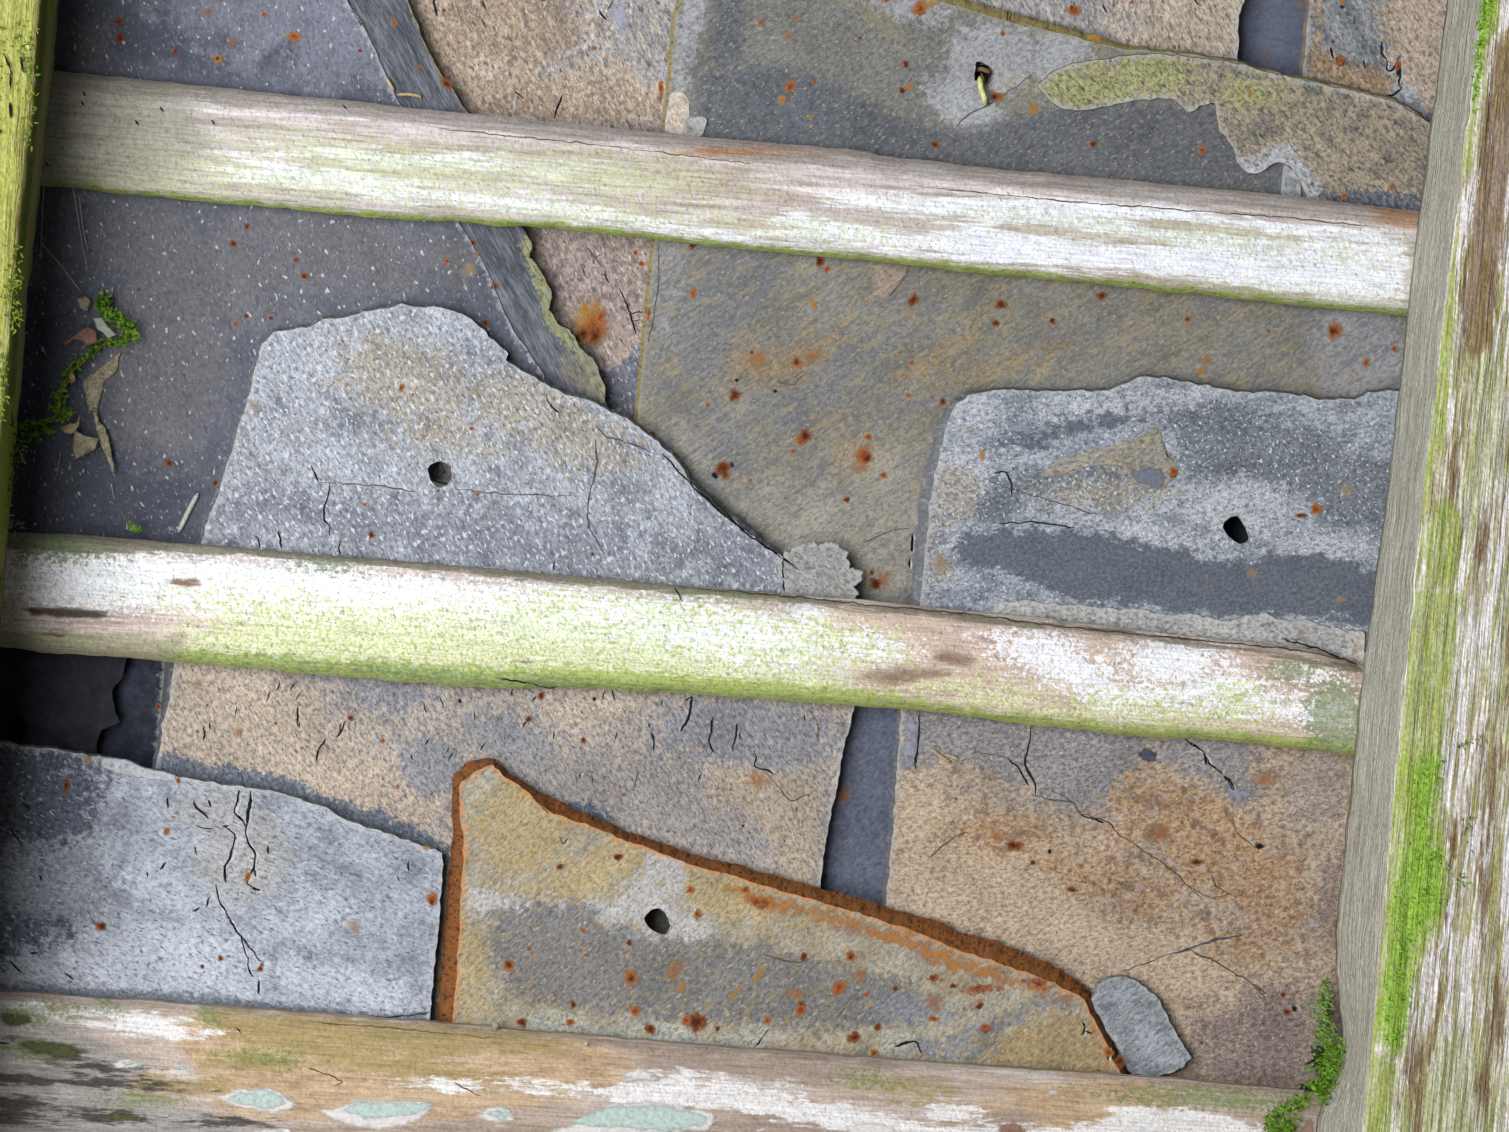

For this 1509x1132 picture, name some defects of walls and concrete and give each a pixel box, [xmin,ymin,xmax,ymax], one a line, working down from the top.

corrosion [911,1,936,15]
corrosion [715,462,730,480]
corrosion [856,434,887,478]
crack [978,727,1234,901]
crack [1185,738,1254,847]
corrosion [1005,841,1036,865]
crack [146,790,269,995]
corrosion [725,886,1069,1034]
crack [1121,934,1268,1002]
corrosion [630,1005,655,1035]
corrosion [681,1012,720,1033]
corrosion [846,1023,880,1056]